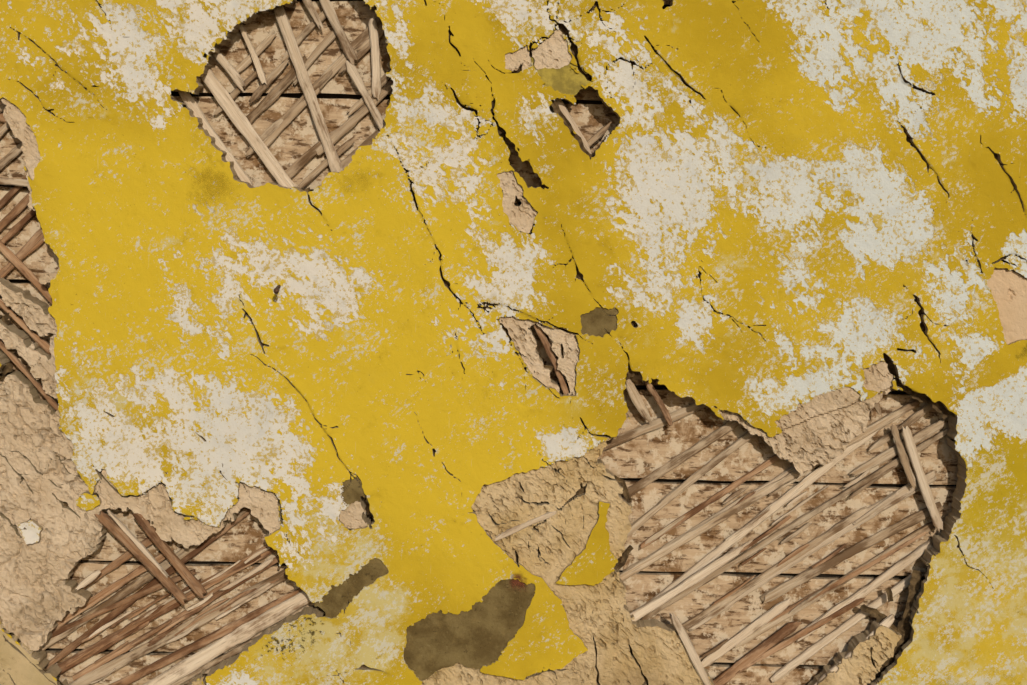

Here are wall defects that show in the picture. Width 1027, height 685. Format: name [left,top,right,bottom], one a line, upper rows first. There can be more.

peeling [18,46,46,66]
peeling [39,73,72,95]
peeling [52,0,619,397]
crack [892,58,950,211]
crack [966,219,1027,273]
crack [980,135,1024,212]
flaking render [0,97,389,685]
crack [239,295,362,490]
crack [388,135,635,567]
flaking render [404,0,1027,685]
crack [883,273,958,419]
crack [472,545,634,685]